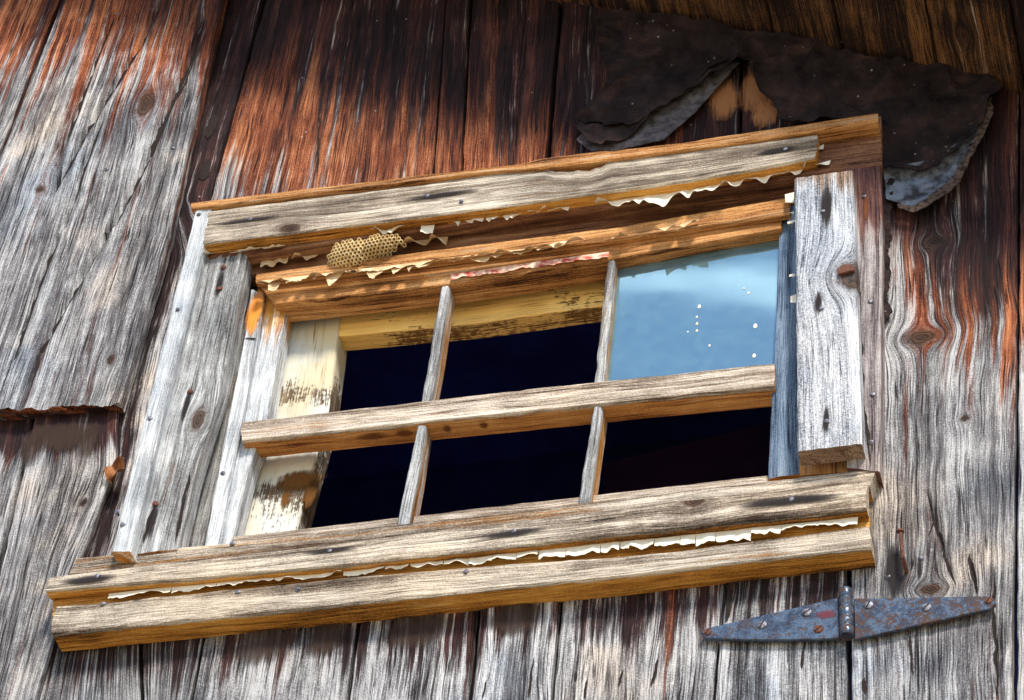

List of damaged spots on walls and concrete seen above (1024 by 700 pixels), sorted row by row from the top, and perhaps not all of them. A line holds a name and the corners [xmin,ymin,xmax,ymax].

peeling [594,144,831,207]
peeling [371,225,448,247]
peeling [454,205,569,226]
peeling [785,192,795,224]
peeling [230,237,609,291]
peeling [108,517,858,599]